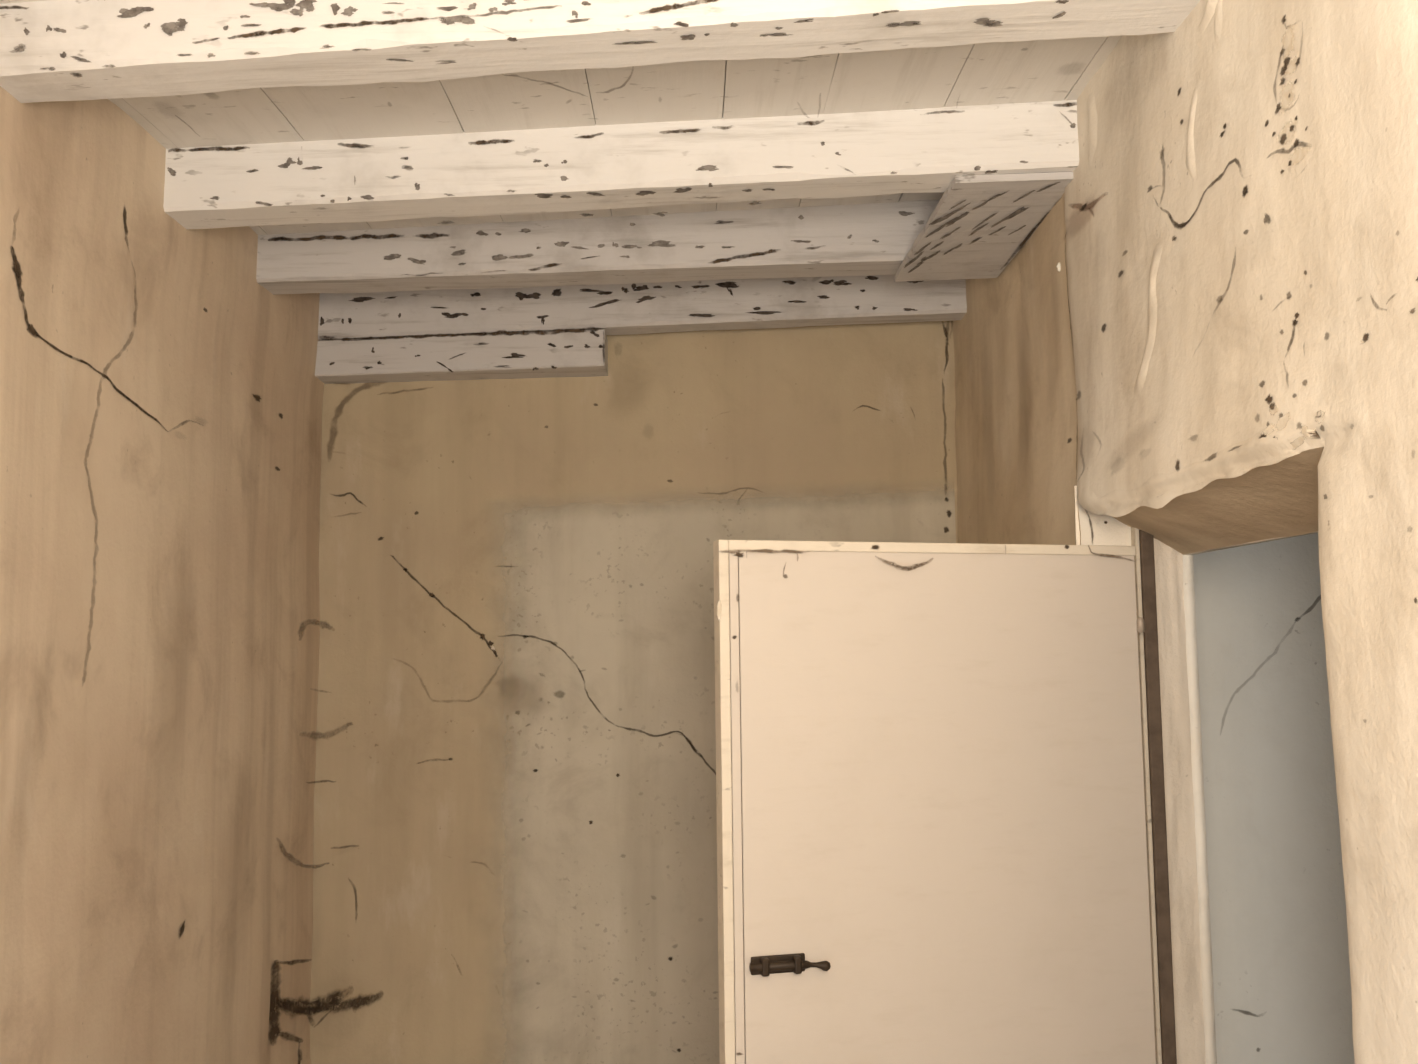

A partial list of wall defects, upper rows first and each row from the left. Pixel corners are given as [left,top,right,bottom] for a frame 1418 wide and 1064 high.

peeling [118,7,188,36]
peeling [223,0,358,30]
peeling [437,0,516,25]
crack [1148,158,1248,229]
crack [121,208,129,241]
peeling [904,182,1060,283]
peeling [580,281,739,308]
peeling [747,276,878,315]
crack [11,246,167,431]
crack [942,326,950,366]
crack [1296,596,1321,621]
crack [378,537,716,775]